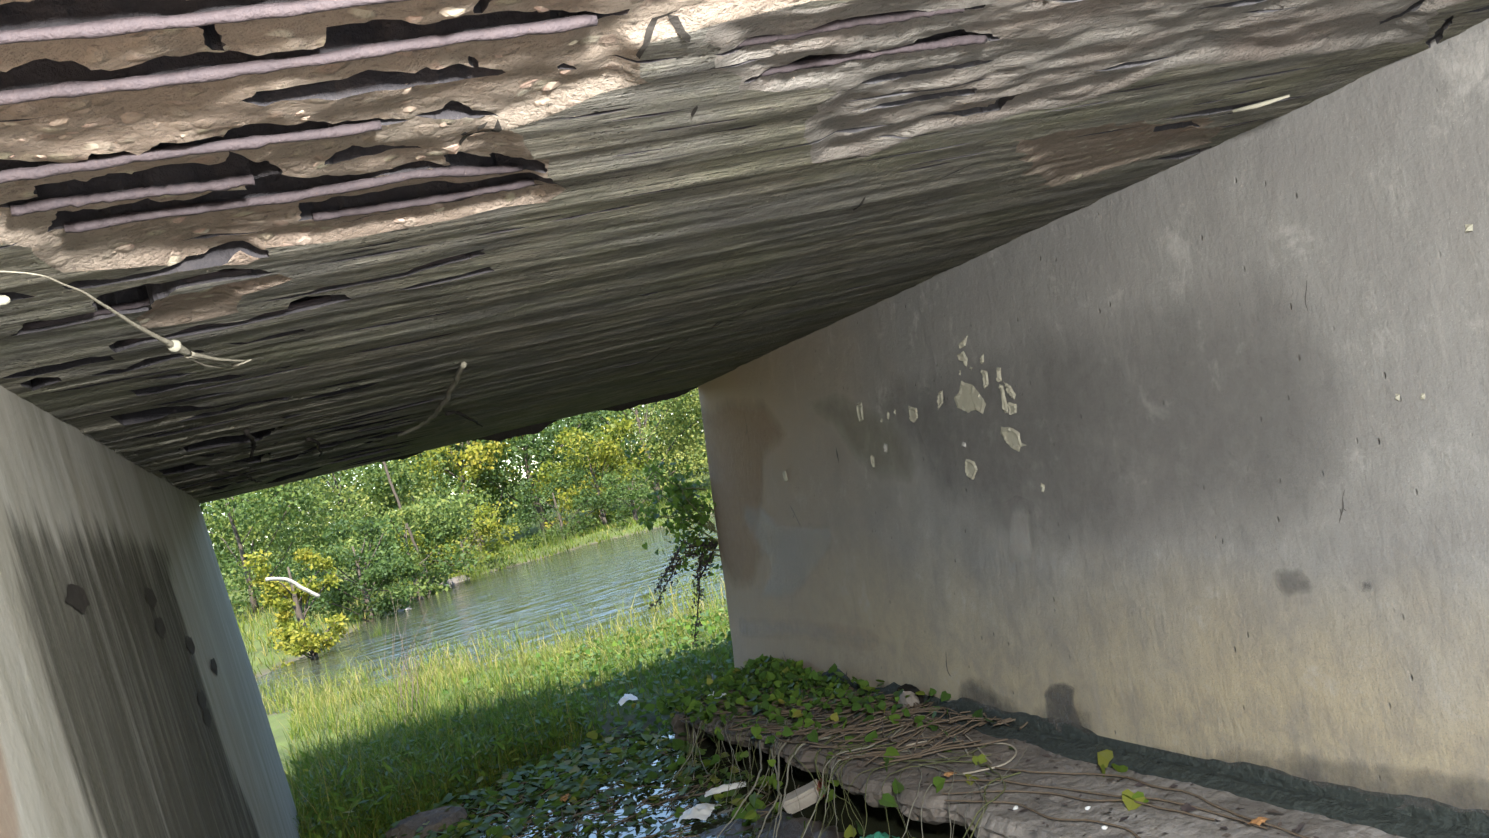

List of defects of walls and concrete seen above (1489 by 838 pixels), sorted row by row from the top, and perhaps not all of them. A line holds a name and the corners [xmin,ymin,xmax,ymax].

spalling [0,0,1489,498]